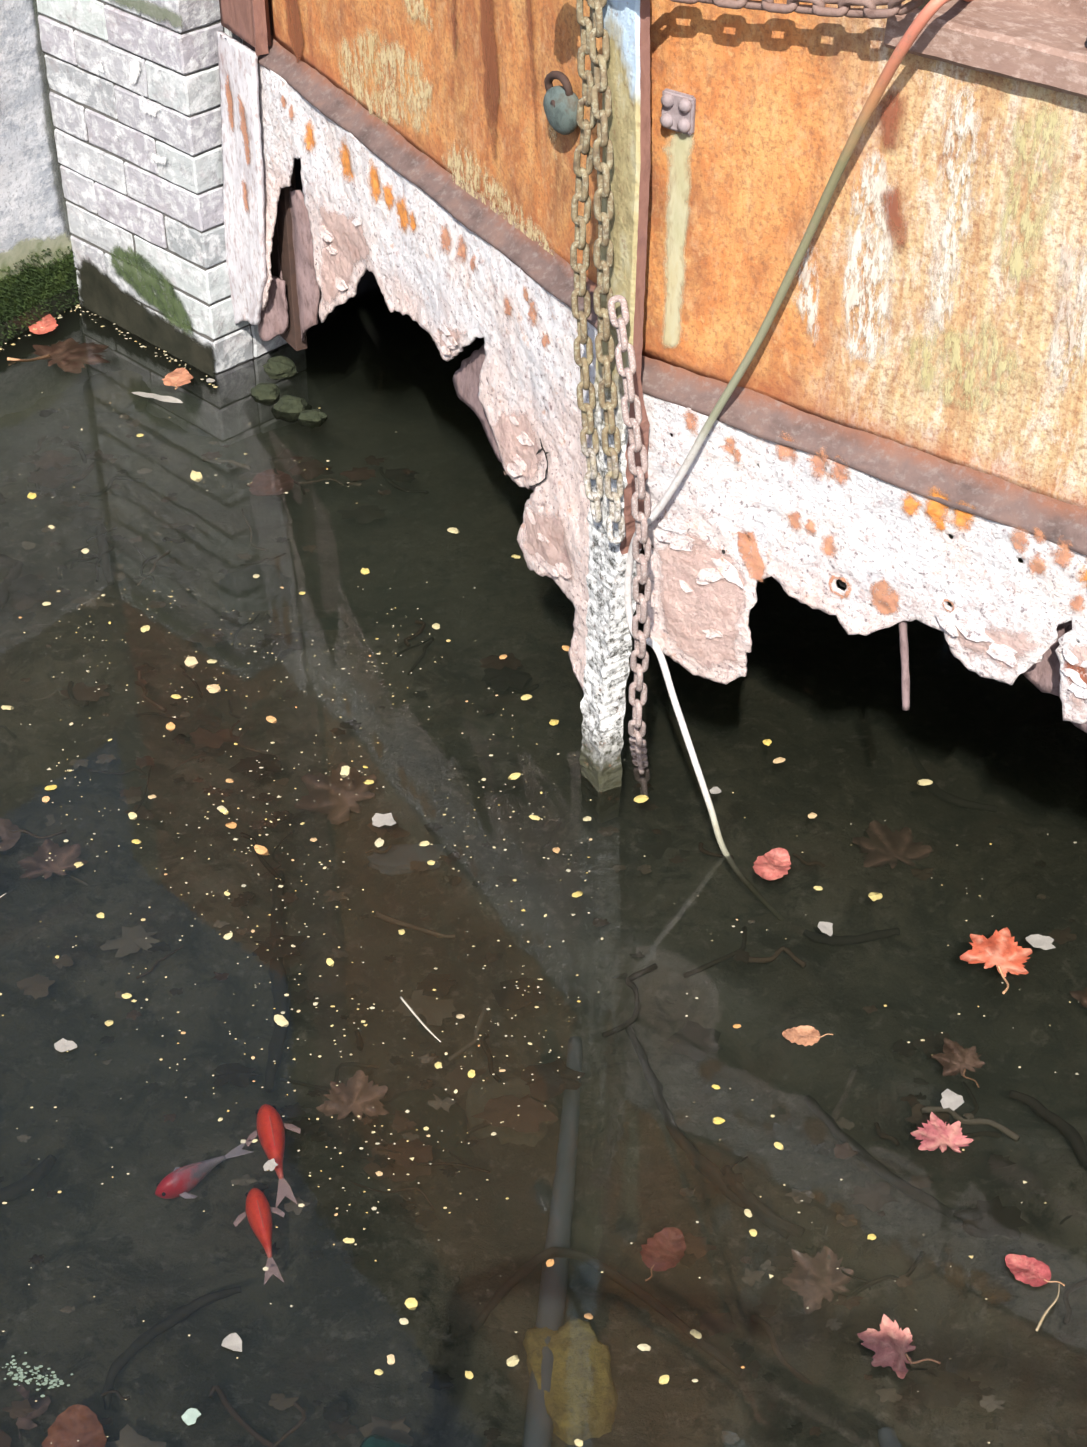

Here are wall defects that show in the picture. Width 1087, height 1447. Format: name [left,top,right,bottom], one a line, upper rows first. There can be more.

peeling [339,30,432,130]
corrosion [480,0,499,154]
corrosion [339,142,416,231]
peeling [448,146,552,254]
corrosion [885,187,905,245]
water stain [0,258,217,393]
peeling [507,416,534,477]
peeling [656,517,694,551]
corrosion [788,512,836,556]
corrosion [903,489,973,531]
peeling [935,599,1017,667]
peeling [1060,647,1087,699]